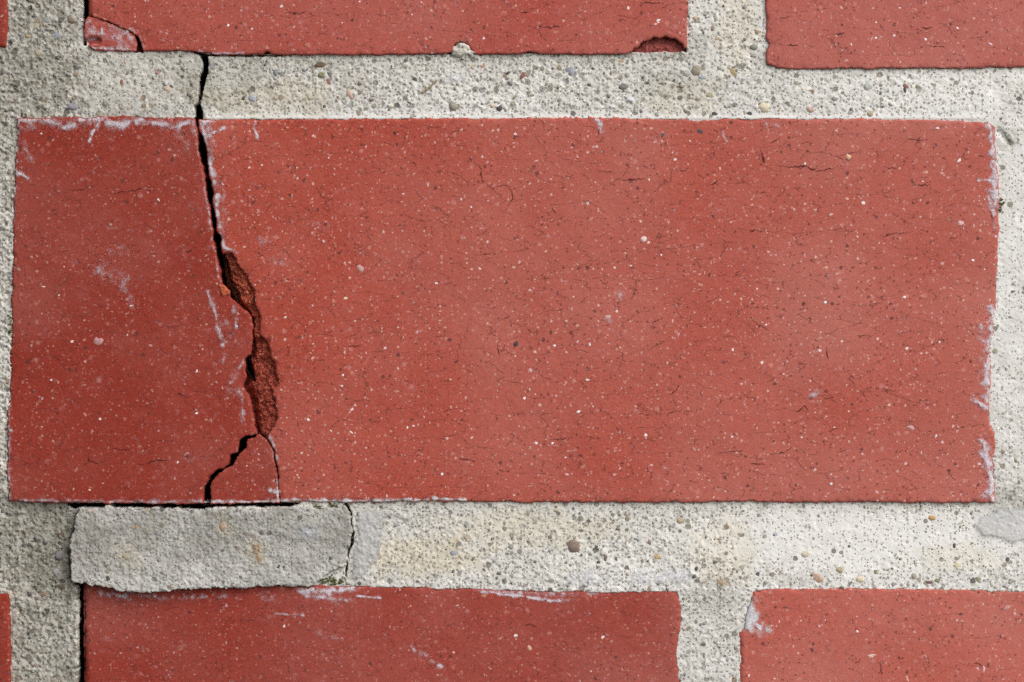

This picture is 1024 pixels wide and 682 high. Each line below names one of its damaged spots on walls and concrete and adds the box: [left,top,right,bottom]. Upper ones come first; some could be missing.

spalling [632,37,686,55]
crack [186,52,282,303]
crack [246,356,256,381]
crack [203,430,283,506]
crack [345,503,354,576]